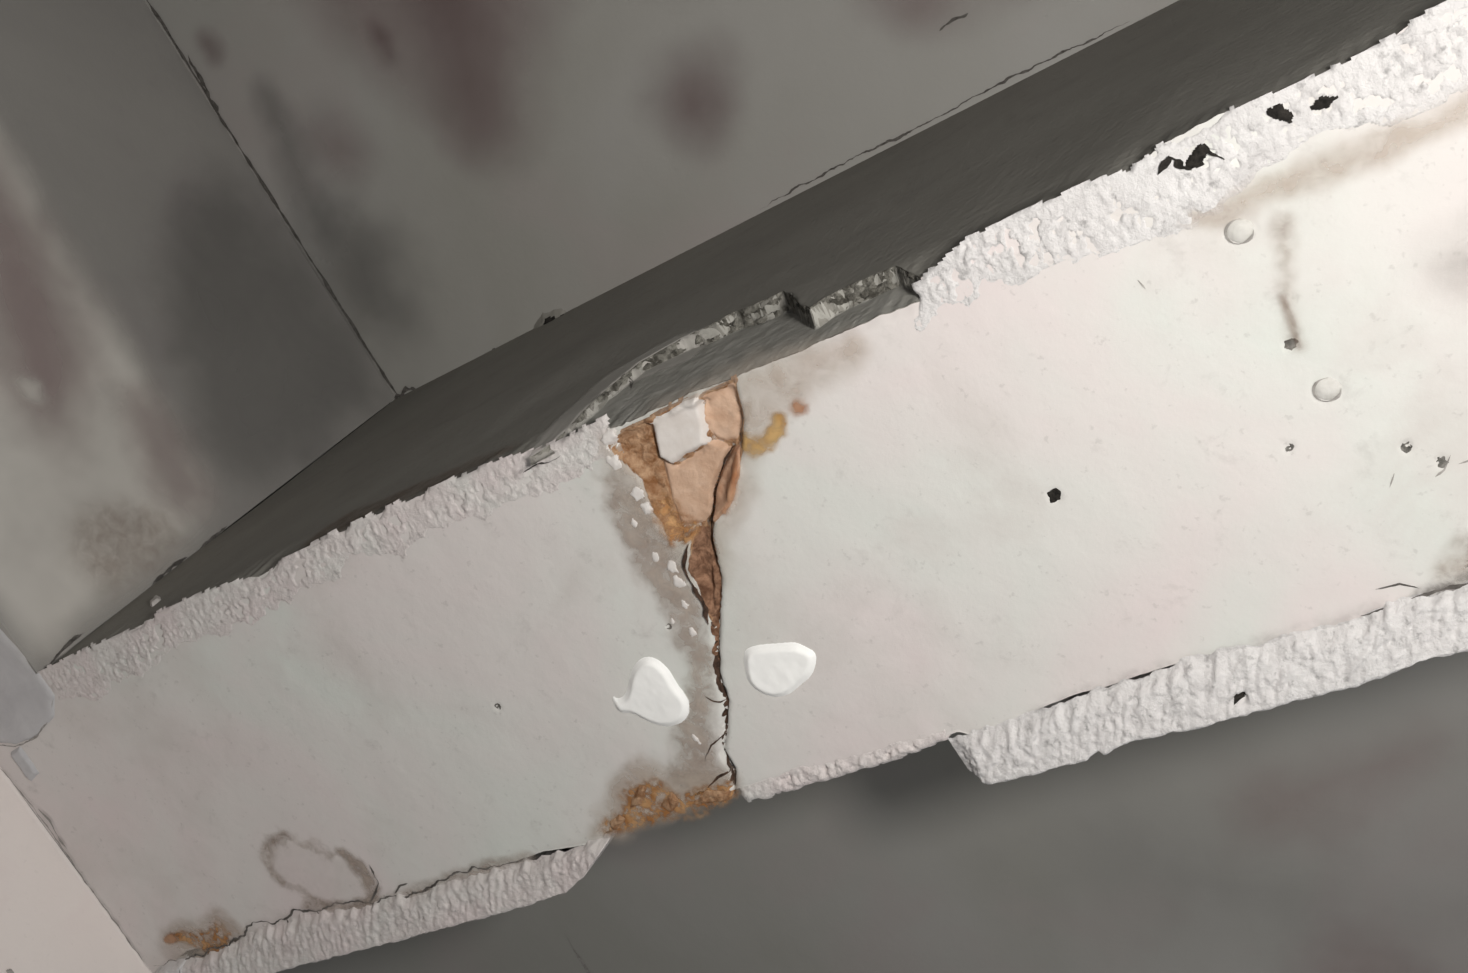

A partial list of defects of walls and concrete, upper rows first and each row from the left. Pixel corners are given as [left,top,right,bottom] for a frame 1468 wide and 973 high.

corrosion [742,402,805,455]
flaking render [523,266,920,785]
crack [1361,566,1468,616]
crack [695,594,736,796]
corrosion [604,769,736,832]
leakage [338,850,378,907]
corrosion [164,916,237,957]